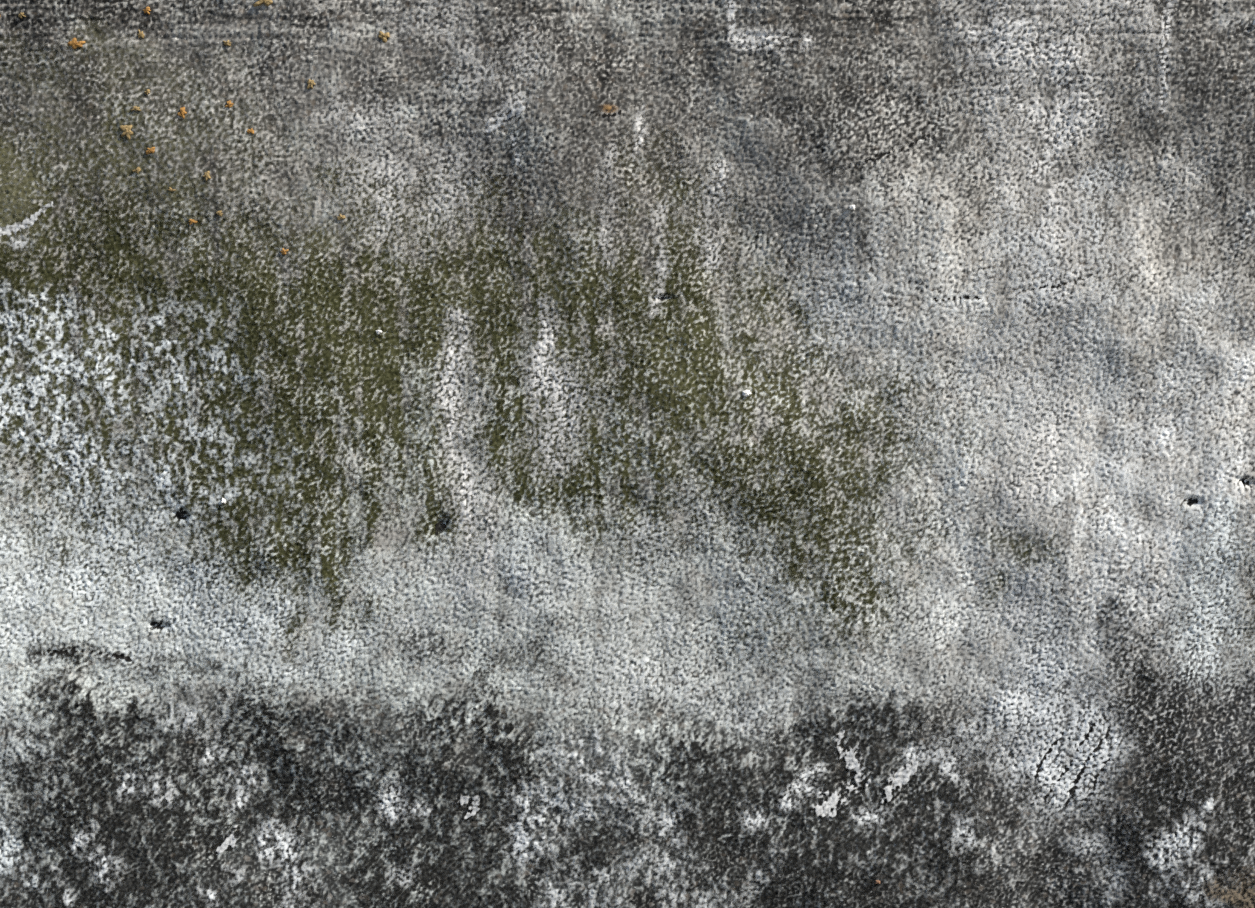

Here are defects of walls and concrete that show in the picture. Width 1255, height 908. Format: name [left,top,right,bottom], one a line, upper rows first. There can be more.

leakage [633,107,646,156]
leakage [705,160,729,208]
leakage [650,247,667,316]
leakage [704,238,721,269]
leakage [822,264,888,343]
leakage [1179,332,1224,388]
leakage [399,301,601,654]
leakage [0,288,536,908]
leakage [564,597,686,709]
leakage [1089,494,1255,871]
leakage [652,695,1028,908]
leakage [530,817,616,878]